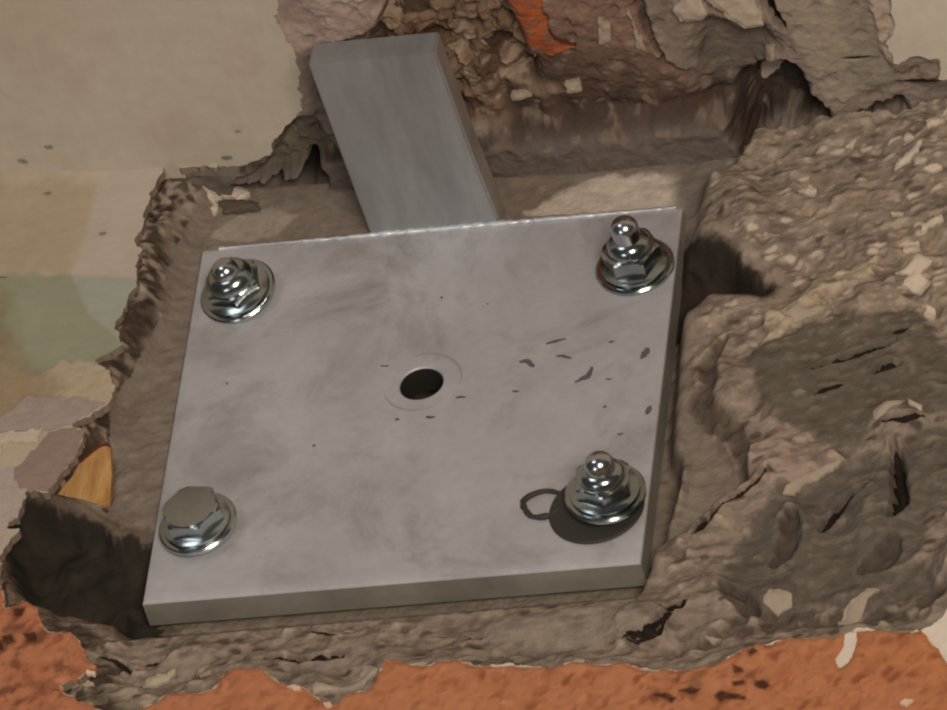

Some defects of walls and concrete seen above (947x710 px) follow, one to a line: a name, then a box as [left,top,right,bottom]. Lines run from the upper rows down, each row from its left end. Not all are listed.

spalling [0,178,261,548]
spalling [254,0,947,672]
spalling [0,553,635,710]
crack [610,599,686,644]
spalling [655,687,699,702]
spalling [715,665,745,701]